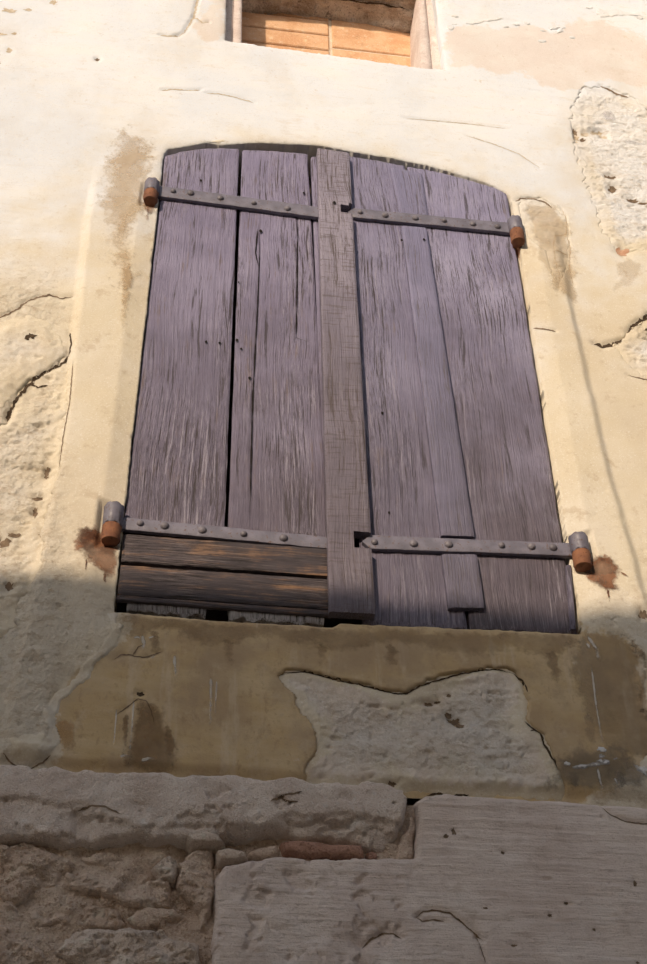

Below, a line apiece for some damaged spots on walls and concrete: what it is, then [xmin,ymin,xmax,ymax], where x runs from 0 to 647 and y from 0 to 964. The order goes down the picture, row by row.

spalling [569,87,647,256]
crack [8,333,73,466]
crack [594,314,647,348]
spalling [612,320,647,377]
spalling [0,357,69,639]
corrosion [75,527,117,581]
corrosion [586,555,627,597]
spalling [279,668,617,801]